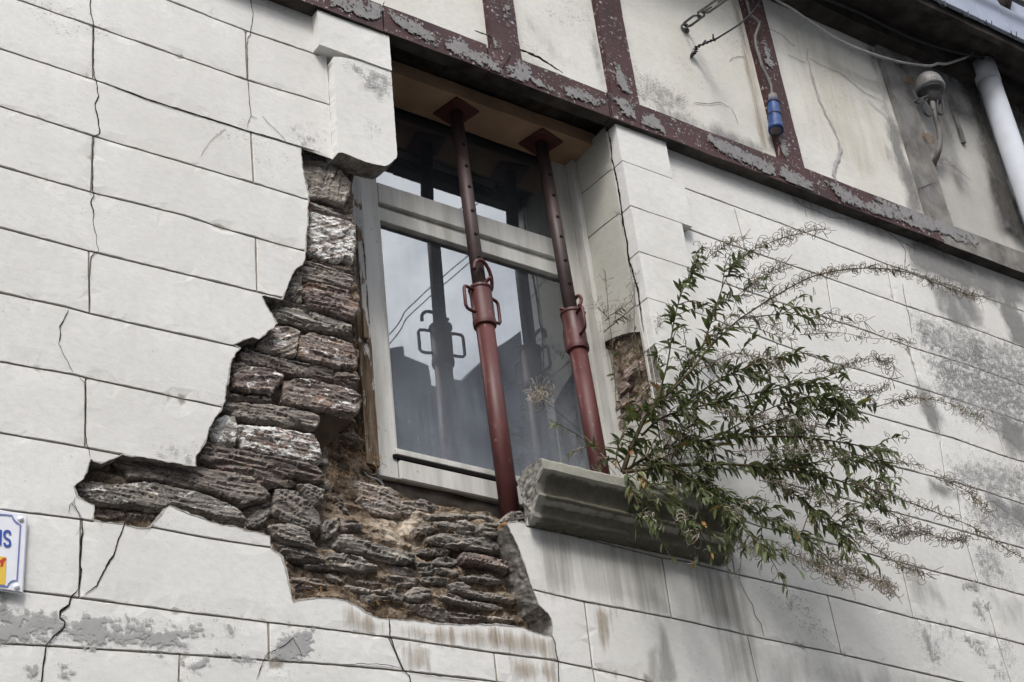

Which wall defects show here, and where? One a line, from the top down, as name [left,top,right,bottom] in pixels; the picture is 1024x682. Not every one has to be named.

peeling [330,0,667,134]
crack [770,28,893,180]
crack [58,0,301,455]
crack [606,91,644,332]
peeling [706,133,980,248]
damp [910,242,1024,346]
flaking render [74,123,553,637]
flaking render [605,332,656,429]
damp [920,388,938,429]
damp [999,415,1024,452]
damp [988,495,1024,524]
crack [41,499,127,682]